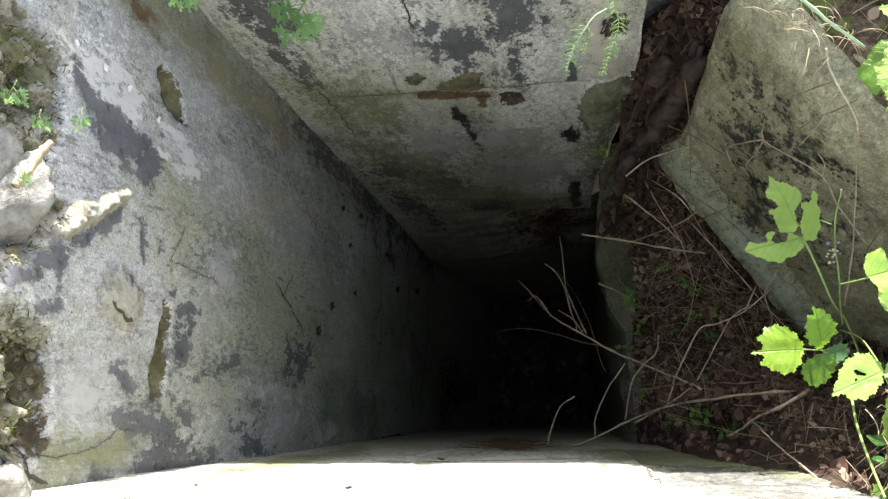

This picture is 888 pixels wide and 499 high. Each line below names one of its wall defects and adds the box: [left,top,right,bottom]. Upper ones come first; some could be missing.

rust [132,0,167,50]
peeling [404,0,576,93]
spalling [600,13,630,38]
rust [414,91,492,108]
peeling [0,18,211,322]
crack [169,228,216,283]
crack [275,272,305,337]
peeling [108,269,223,474]
peeling [192,350,242,383]
crack [0,427,133,485]